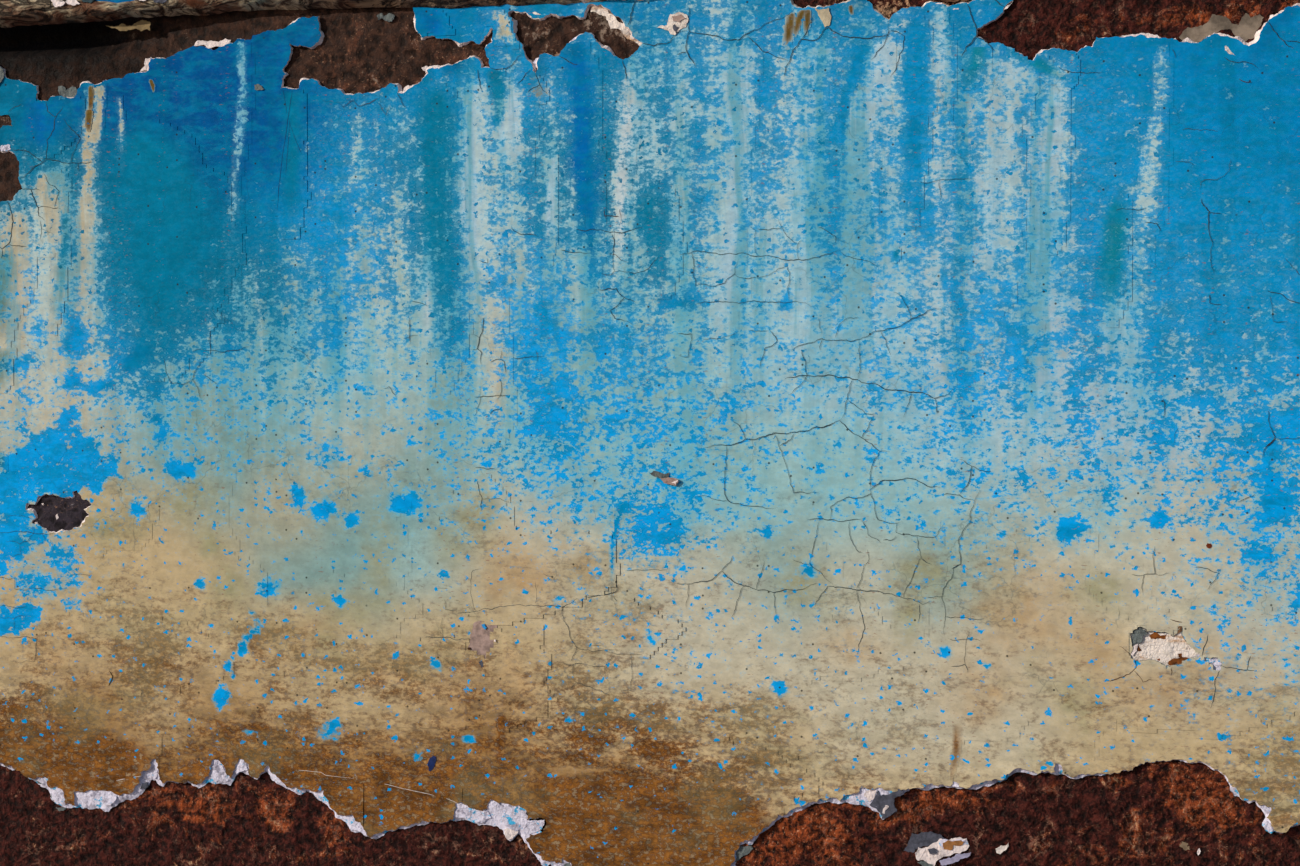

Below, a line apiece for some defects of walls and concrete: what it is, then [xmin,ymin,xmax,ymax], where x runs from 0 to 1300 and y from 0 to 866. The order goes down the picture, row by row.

damp [0,39,255,393]
peeling [0,0,493,101]
damp [401,41,687,450]
peeling [508,0,642,73]
damp [699,42,764,398]
damp [829,8,1075,316]
damp [1088,44,1174,328]
peeling [977,0,1300,60]
crack [428,209,991,695]
peeling [0,759,571,866]
rust [520,735,823,866]
peeling [730,759,1300,866]